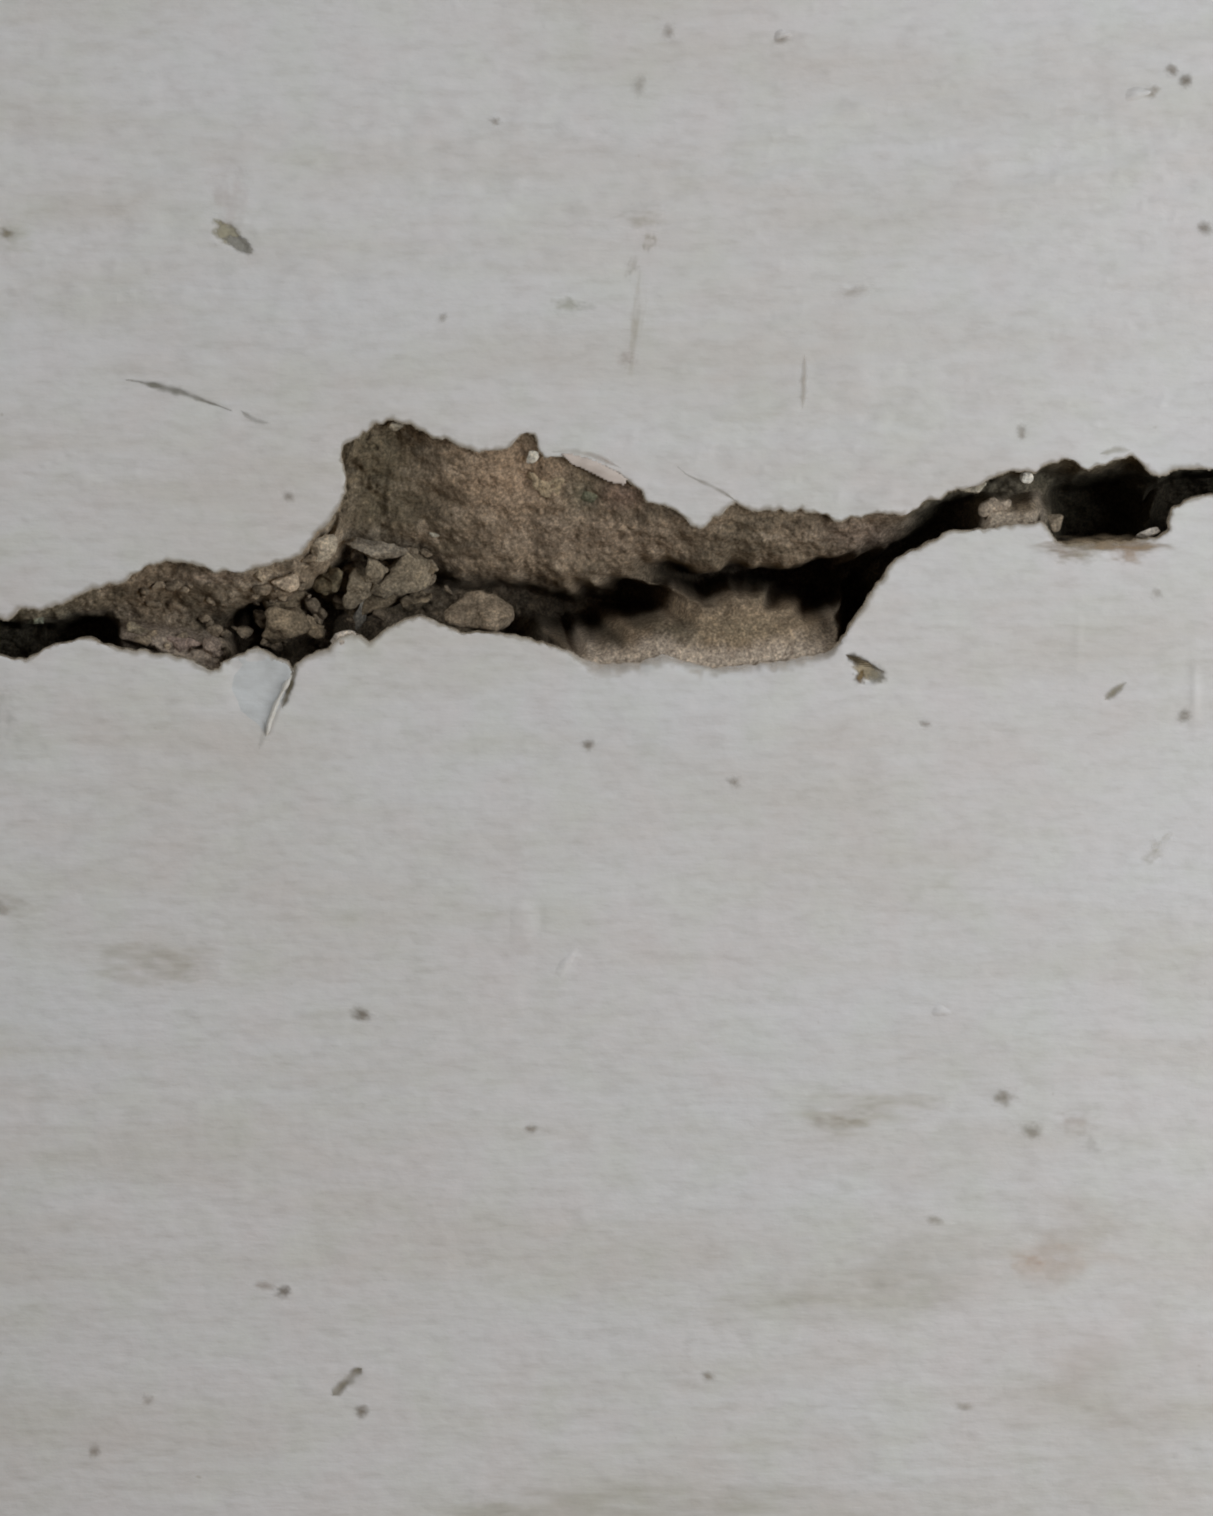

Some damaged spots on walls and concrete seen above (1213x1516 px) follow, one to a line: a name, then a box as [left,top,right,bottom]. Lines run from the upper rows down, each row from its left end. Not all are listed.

spalling [234,419,908,683]
crack [897,455,1213,557]
crack [0,560,295,737]